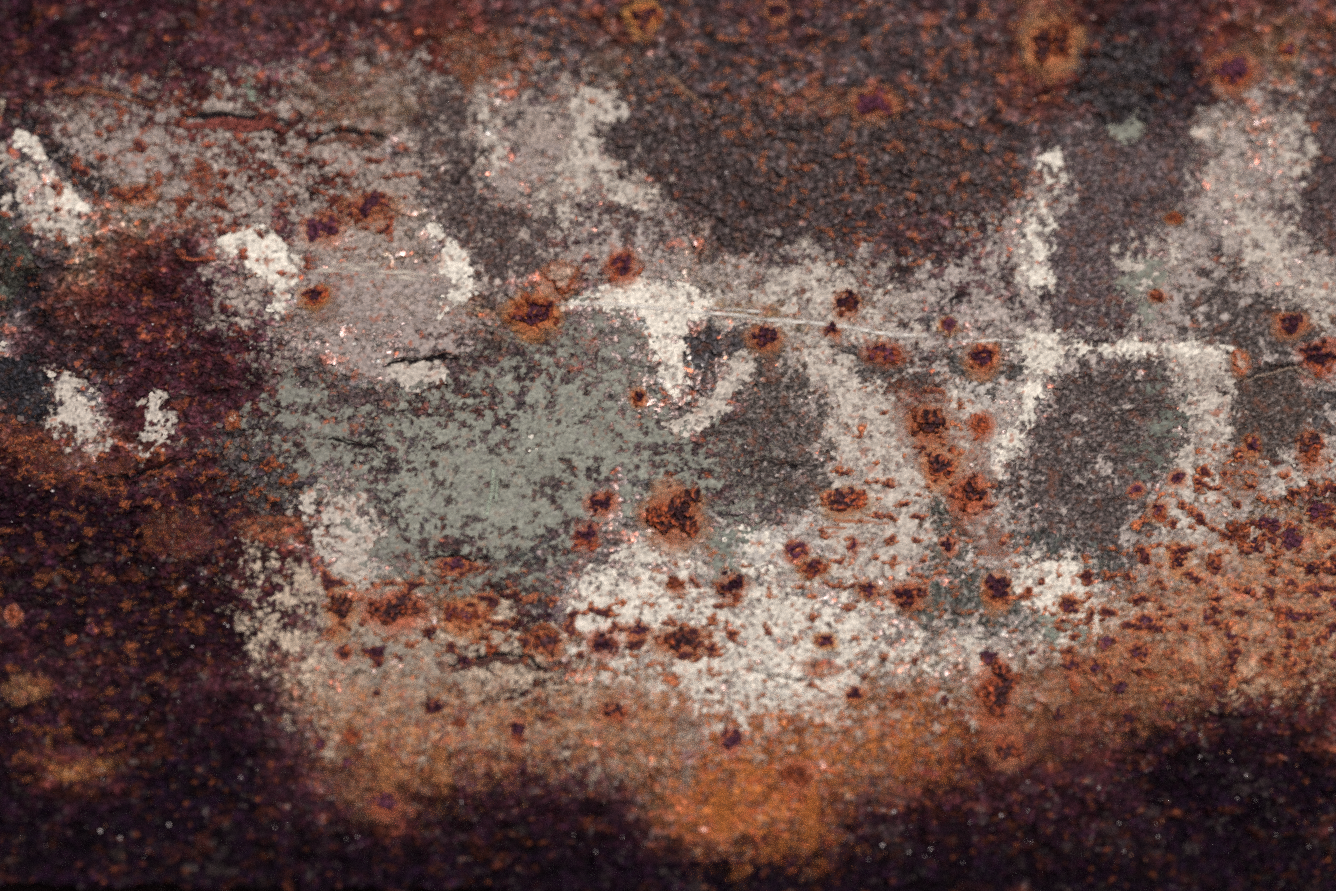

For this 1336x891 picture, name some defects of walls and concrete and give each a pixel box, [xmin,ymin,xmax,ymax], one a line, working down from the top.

peeling [354,58,369,81]
corrosion [1016,15,1084,102]
corrosion [1214,39,1297,87]
corrosion [692,19,970,218]
corrosion [866,343,906,364]
corrosion [968,344,999,375]
spalling [0,341,113,460]
peeling [136,389,177,462]
corrosion [71,437,304,543]
peeling [489,599,519,621]
peeling [1007,676,1069,711]
peeling [923,711,949,745]